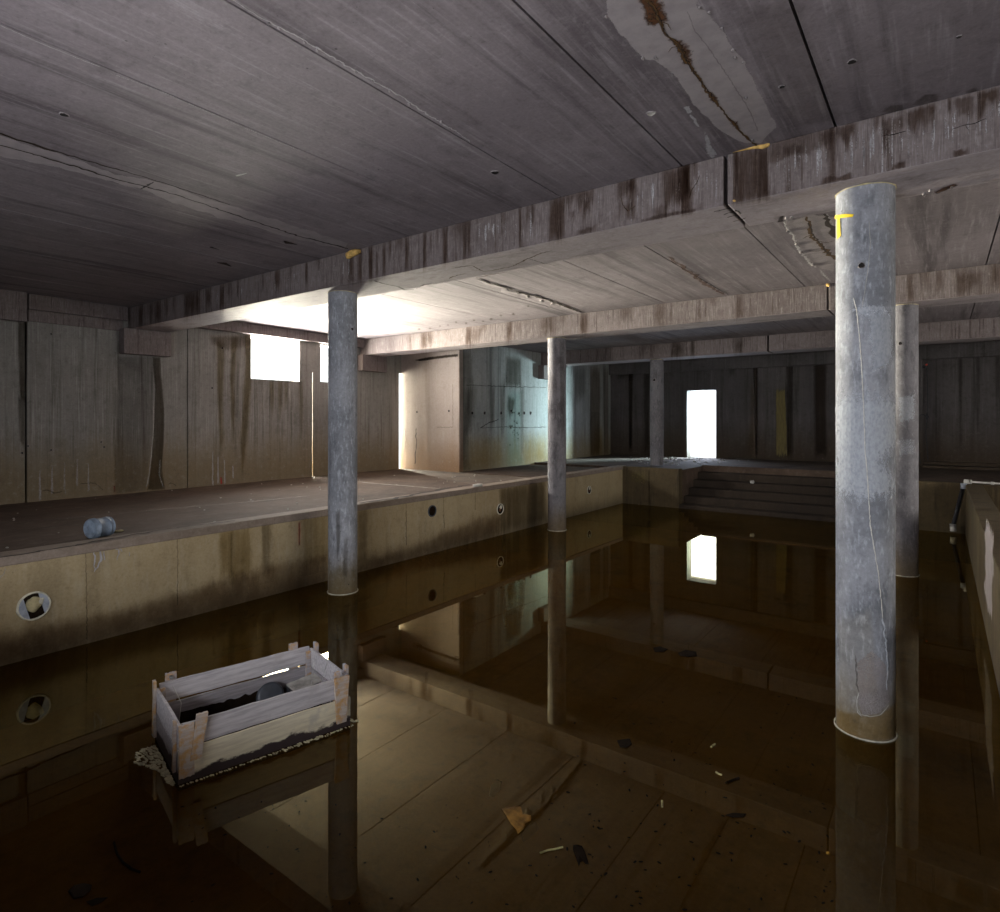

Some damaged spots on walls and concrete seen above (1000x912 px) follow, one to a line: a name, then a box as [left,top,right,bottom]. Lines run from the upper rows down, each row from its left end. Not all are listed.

crack [0,145,348,249]
peeling [605,0,777,143]
peeling [778,215,836,281]
leakage [844,101,1000,173]
leakage [148,358,164,489]
crack [853,224,889,688]